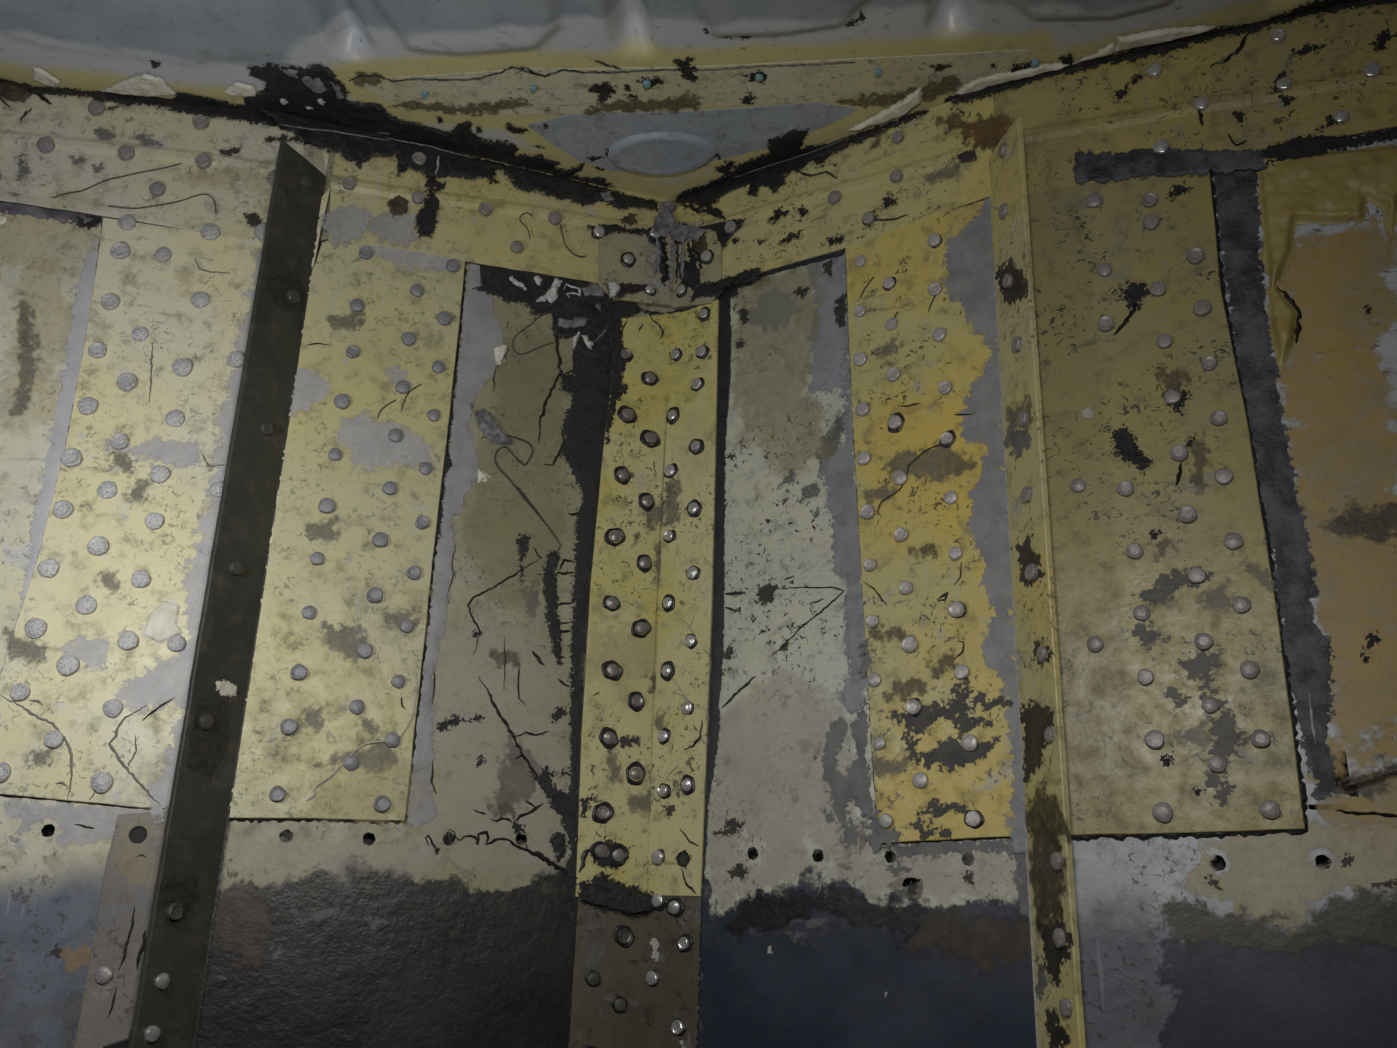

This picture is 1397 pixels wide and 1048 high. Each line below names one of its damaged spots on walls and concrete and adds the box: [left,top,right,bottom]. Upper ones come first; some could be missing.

peeling [101,60,177,111]
peeling [587,75,664,103]
peeling [673,57,699,85]
peeling [842,87,923,133]
peeling [954,24,1217,103]
peeling [243,212,266,227]
peeling [757,205,809,247]
peeling [1256,144,1397,372]
peeling [509,276,604,350]
peeling [288,365,330,417]
leakage [1371,878,1397,889]
leakage [727,883,927,948]